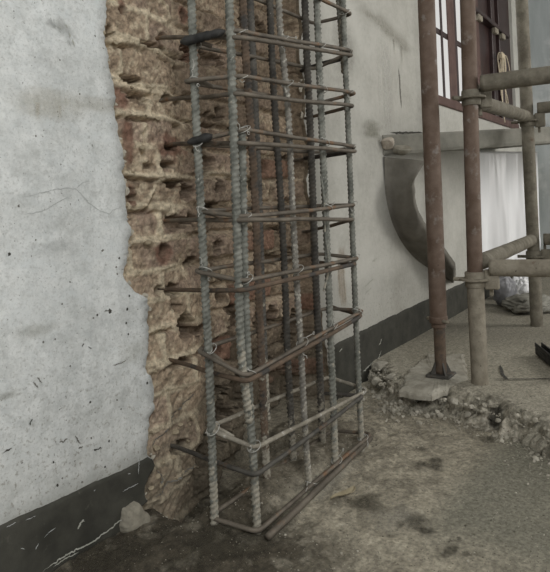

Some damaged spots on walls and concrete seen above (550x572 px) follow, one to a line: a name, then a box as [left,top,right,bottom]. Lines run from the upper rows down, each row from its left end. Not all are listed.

flaking render [195,0,226,33]
crack [22,181,119,214]
flaking render [103,0,210,523]
flaking render [197,40,246,488]
flaking render [247,222,258,370]
flaking render [254,0,330,410]
flaking render [252,378,261,422]